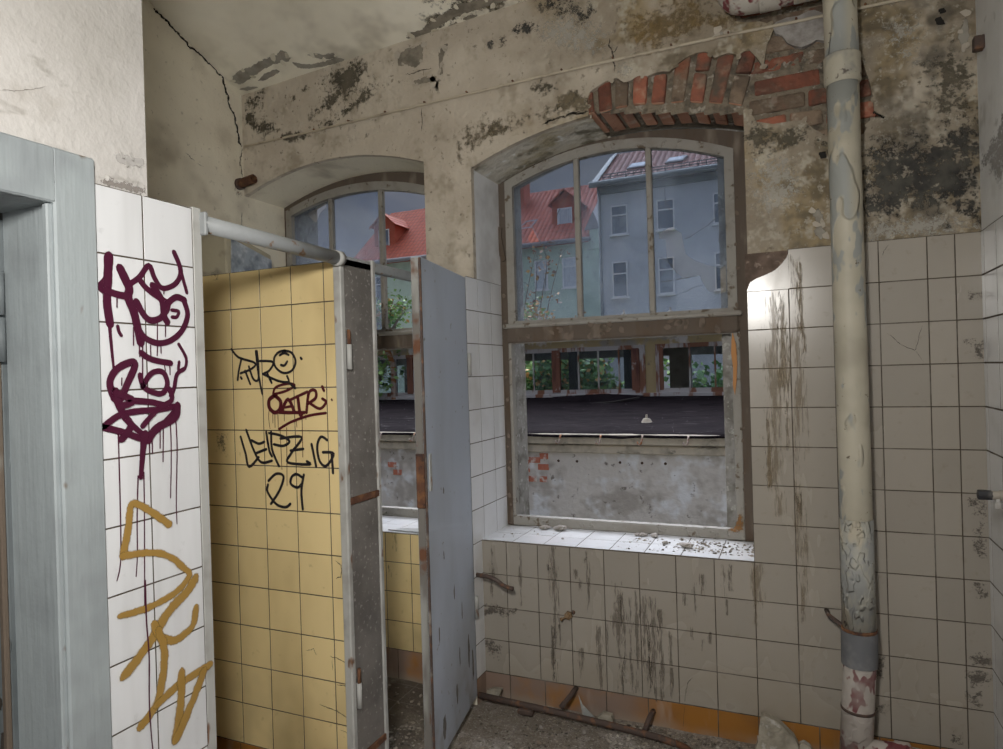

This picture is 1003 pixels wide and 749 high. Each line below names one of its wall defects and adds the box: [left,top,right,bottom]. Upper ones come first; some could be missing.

crack [153,8,243,174]
water stain [245,89,309,143]
peeling [230,50,344,91]
water stain [293,58,373,128]
water stain [458,116,530,159]
water stain [487,22,534,49]
water stain [530,80,592,120]
water stain [535,0,596,25]
flaking render [588,0,828,136]
flaking render [859,47,881,134]
water stain [861,53,981,229]
water stain [596,592,674,701]